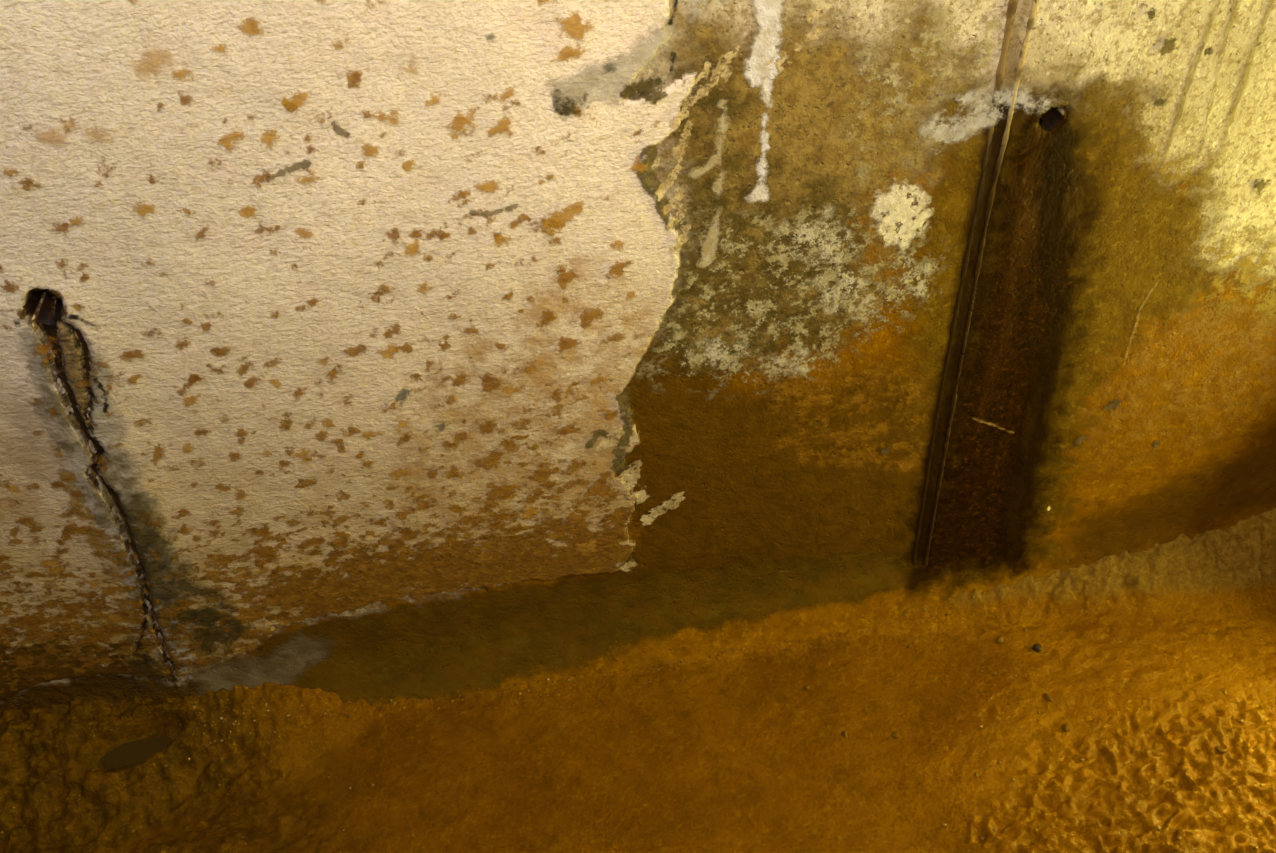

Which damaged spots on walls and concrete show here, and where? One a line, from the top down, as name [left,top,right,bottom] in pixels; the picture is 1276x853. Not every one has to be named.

rust [238,18,263,36]
rust [556,13,593,61]
crack [668,0,678,71]
peeling [766,7,828,73]
rust [174,70,192,105]
rust [347,71,362,88]
water stain [620,0,1051,417]
peeling [0,0,740,677]
rust [0,78,1276,705]
crack [15,296,180,687]
water stain [192,634,333,697]